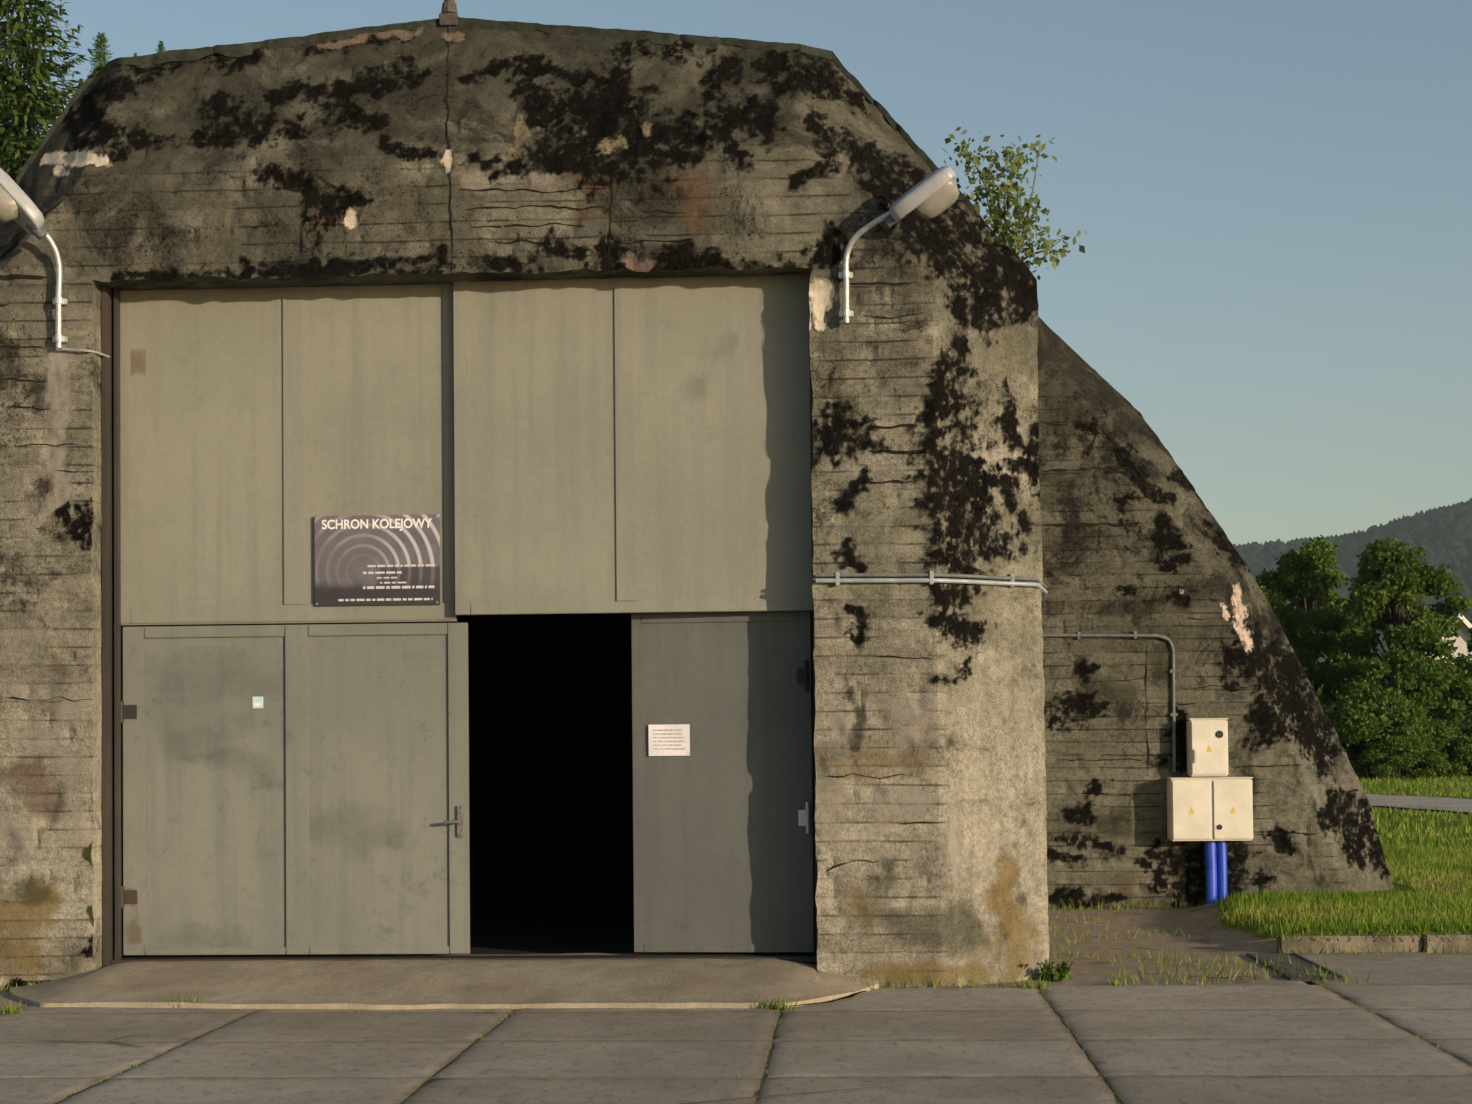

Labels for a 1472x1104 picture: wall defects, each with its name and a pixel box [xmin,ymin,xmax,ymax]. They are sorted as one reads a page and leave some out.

spalling [40,150,109,177]
damp [61,29,456,281]
crack [411,27,688,275]
damp [458,38,1041,685]
spalling [809,279,838,331]
damp [47,348,94,550]
damp [1110,442,1251,609]
damp [1044,659,1110,732]
damp [1156,706,1188,774]
spalling [1220,584,1254,652]
damp [1218,613,1390,880]
damp [1047,778,1298,908]